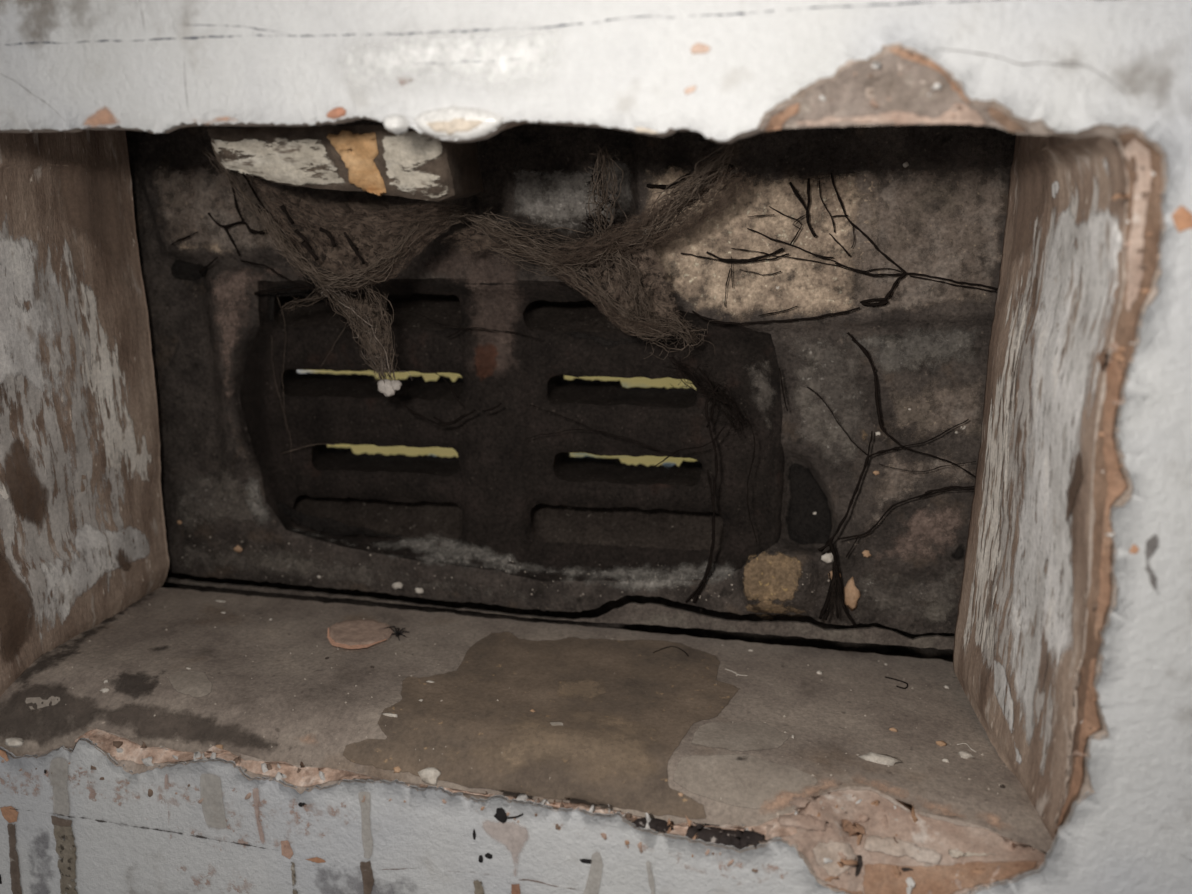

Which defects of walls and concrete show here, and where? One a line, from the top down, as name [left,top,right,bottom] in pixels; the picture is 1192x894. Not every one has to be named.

flaking render [760,46,1032,135]
peeling [211,107,482,198]
peeling [0,213,151,638]
peeling [963,132,1192,837]
spalling [327,619,393,649]
leakage [0,685,277,748]
flaking render [75,729,373,787]
leakage [343,632,817,819]
flaking render [408,783,1045,894]